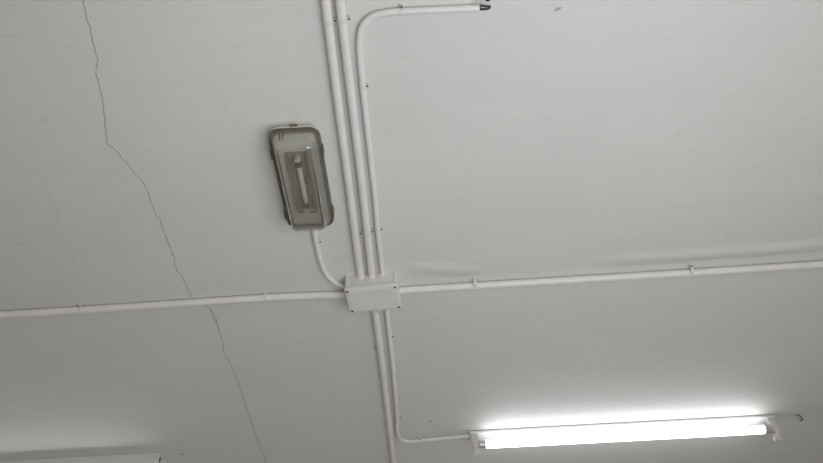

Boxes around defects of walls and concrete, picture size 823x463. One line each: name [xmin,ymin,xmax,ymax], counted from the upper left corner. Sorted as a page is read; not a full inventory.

crack [83,0,267,463]